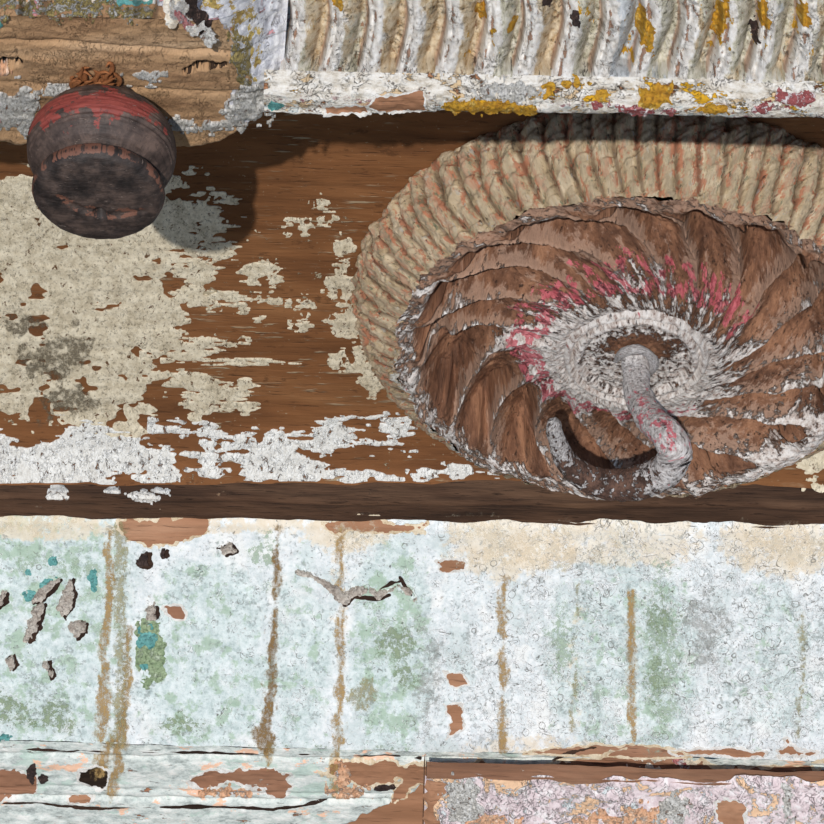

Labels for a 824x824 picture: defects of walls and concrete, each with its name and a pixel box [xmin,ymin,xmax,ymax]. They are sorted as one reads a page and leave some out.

peeling [321,90,427,118]
peeling [0,164,500,505]
peeling [116,518,211,570]
peeling [22,577,89,644]
damp [109,522,131,748]
crack [295,569,417,607]
damp [375,626,417,687]
damp [643,561,681,737]
damp [0,688,76,735]
damp [346,677,377,710]
peeling [0,763,48,805]
peeling [181,767,294,799]